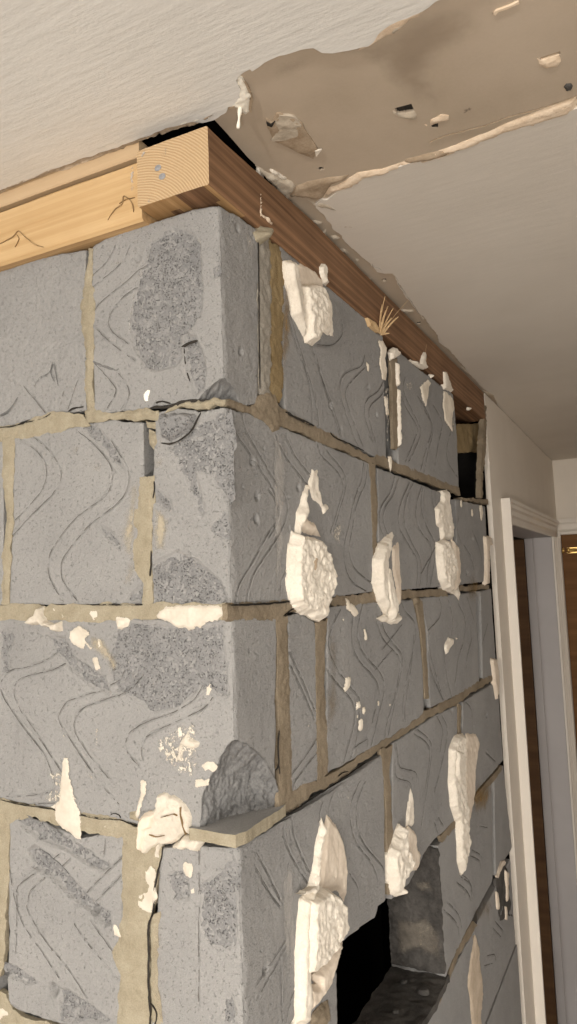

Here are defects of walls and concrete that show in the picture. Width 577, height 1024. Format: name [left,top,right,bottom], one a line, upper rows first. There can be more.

flaking render [0,115,212,193]
flaking render [228,75,253,129]
flaking render [255,97,577,211]
leakage [308,469,329,514]
crack [2,800,188,1024]
spalling [387,846,446,974]